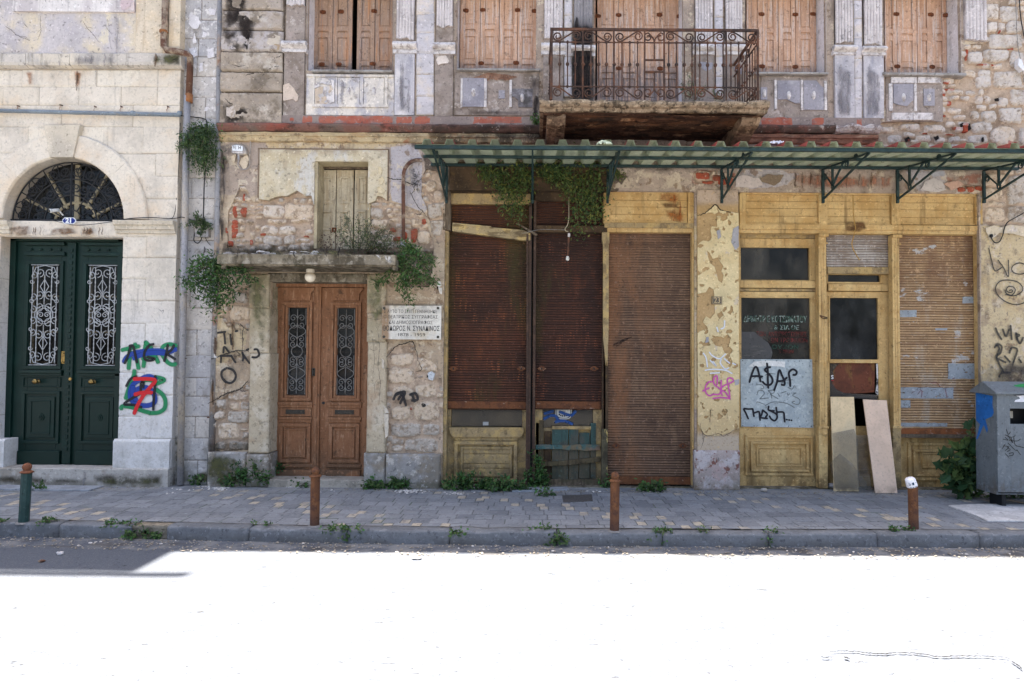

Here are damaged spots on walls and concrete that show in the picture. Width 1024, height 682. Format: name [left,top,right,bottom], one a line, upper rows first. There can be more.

water stain [226,0,261,50]
spalling [225,186,316,254]
rust [662,194,682,221]
peeling [697,206,739,436]